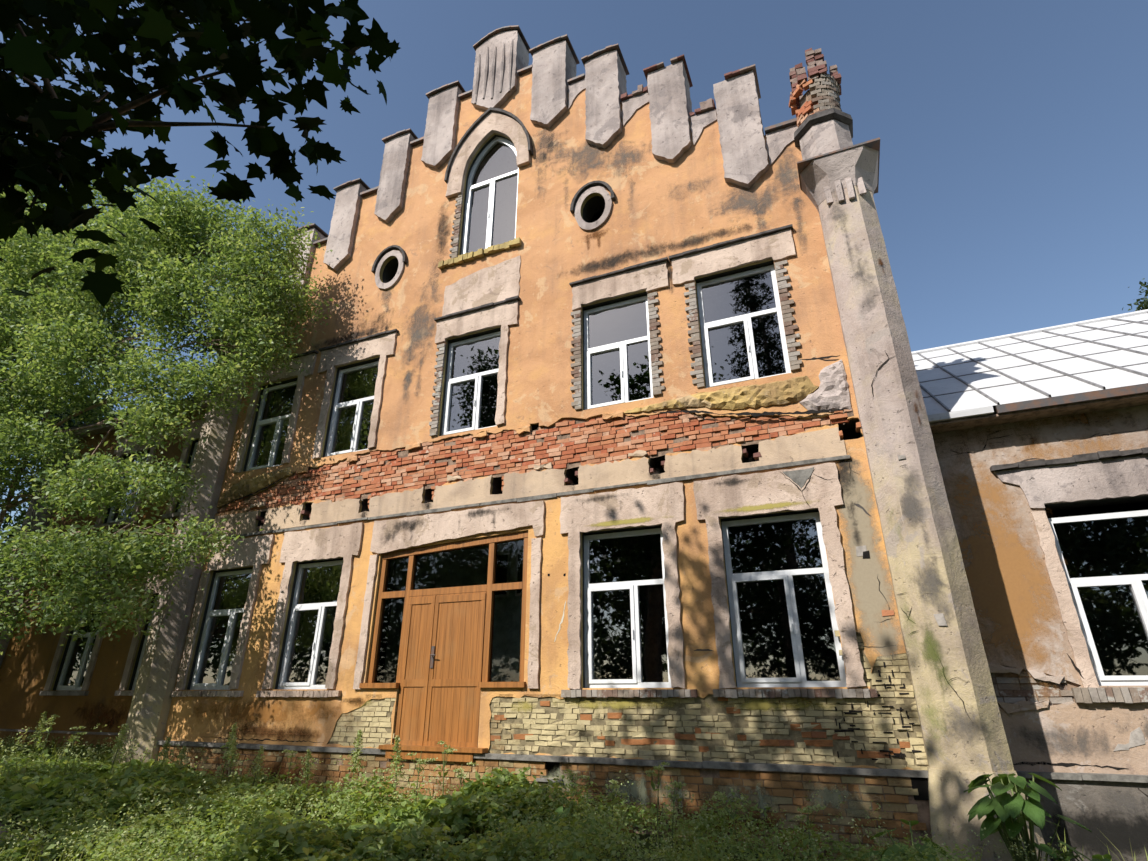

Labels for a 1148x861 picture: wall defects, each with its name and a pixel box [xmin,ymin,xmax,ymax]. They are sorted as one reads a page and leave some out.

water stain [572,156,802,311]
spalling [217,310,854,514]
flaking render [647,292,665,396]
flaking render [684,282,705,388]
peeling [488,459,928,770]
crack [858,576,972,721]
peeling [949,472,1080,714]
water stain [1055,811,1148,861]